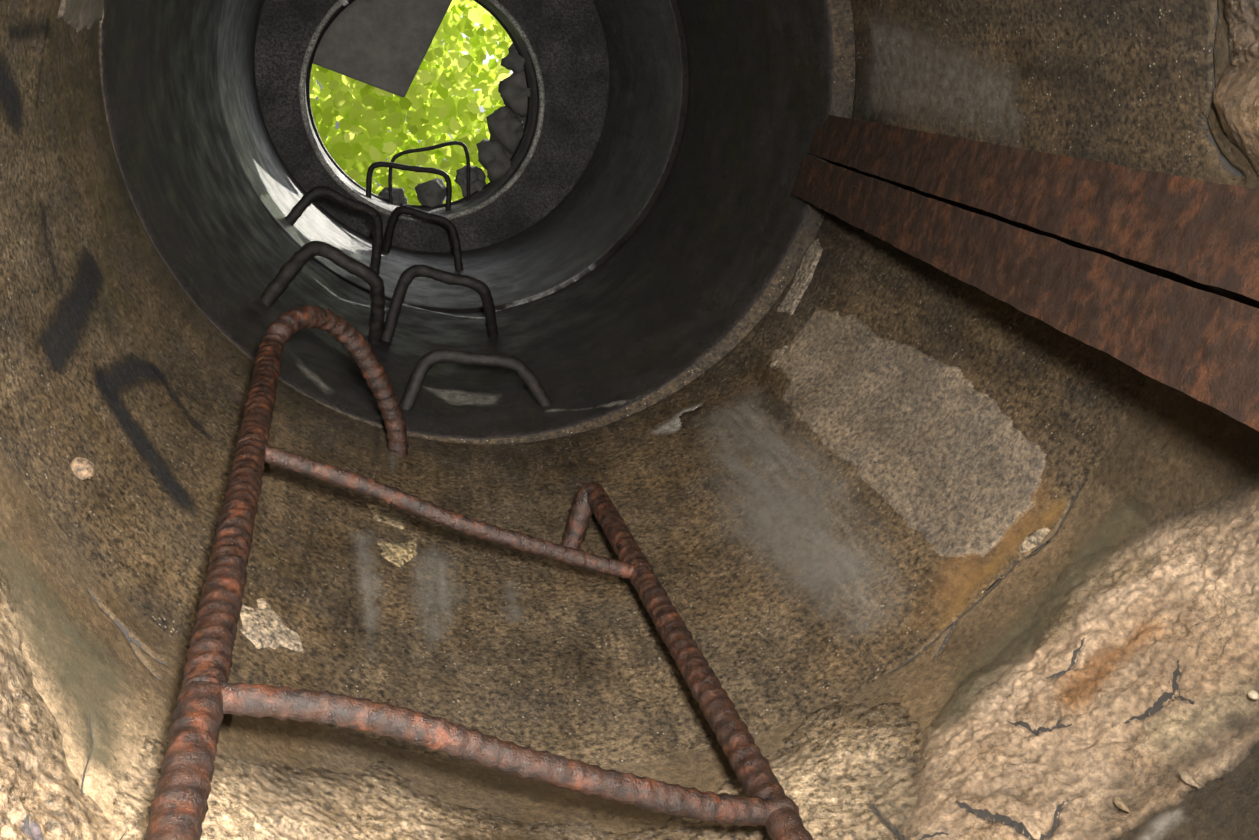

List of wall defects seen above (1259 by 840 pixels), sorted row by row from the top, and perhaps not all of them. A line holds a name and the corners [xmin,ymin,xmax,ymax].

spalling [777,238,823,315]
peeling [770,307,1050,558]
crack [1045,637,1085,679]
crack [1124,660,1194,724]
crack [1008,717,1072,736]
damp [200,754,772,840]
crack [867,797,1069,840]